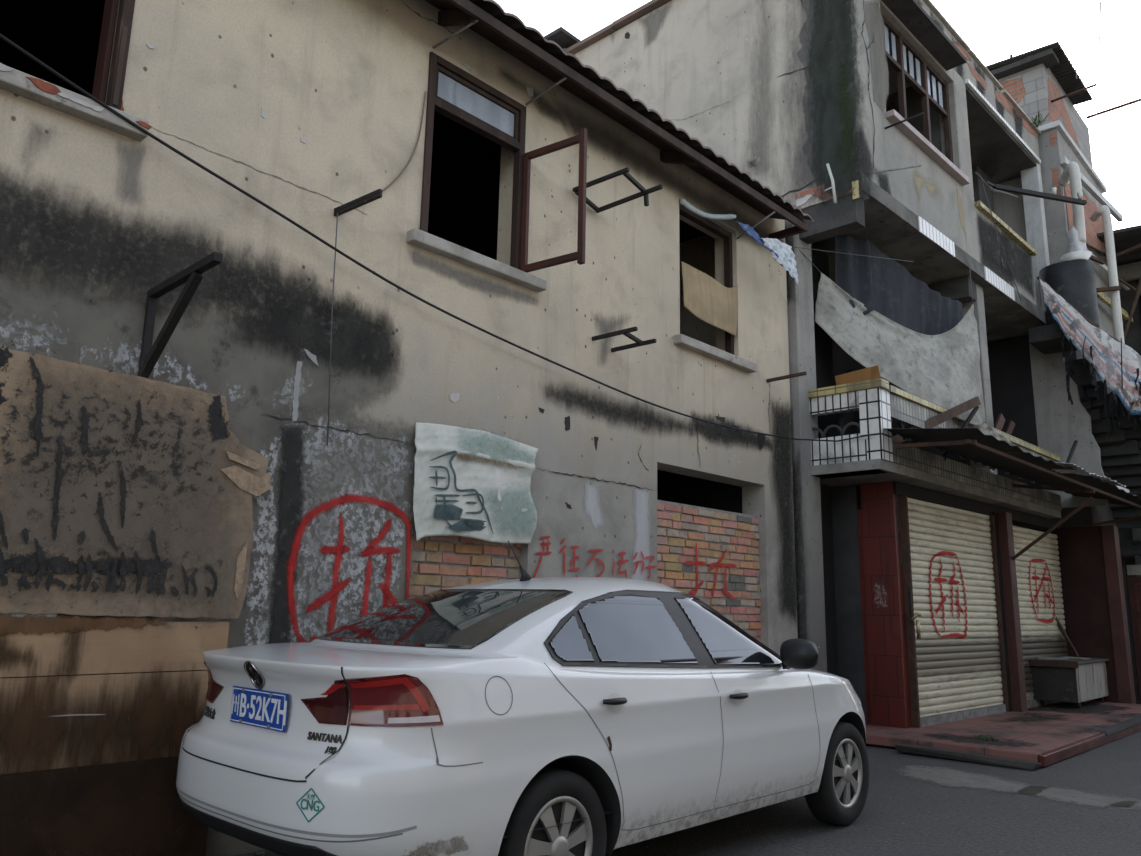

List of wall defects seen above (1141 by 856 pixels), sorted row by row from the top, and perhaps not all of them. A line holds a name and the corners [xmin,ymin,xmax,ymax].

leakage [809,0,870,199]
leakage [123,147,141,198]
crack [152,127,367,215]
peeling [0,320,60,356]
peeling [80,340,142,374]
peeling [153,346,207,390]
leakage [0,267,417,856]